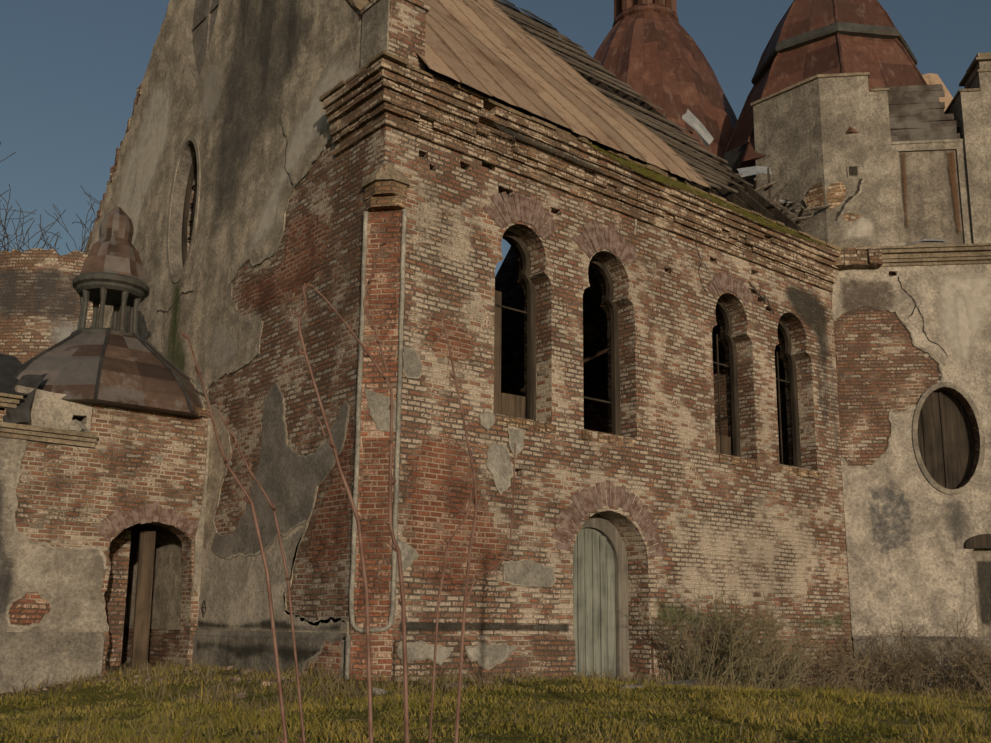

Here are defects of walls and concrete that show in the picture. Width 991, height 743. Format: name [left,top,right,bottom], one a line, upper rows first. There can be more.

damp [251,62,356,245]
crack [835,178,865,221]
peeling [187,127,400,677]
spalling [426,316,475,364]
peeling [833,274,944,470]
crack [898,276,948,356]
peeling [12,440,198,569]
spalling [403,427,556,594]
damp [871,488,913,550]
peeling [5,590,54,630]